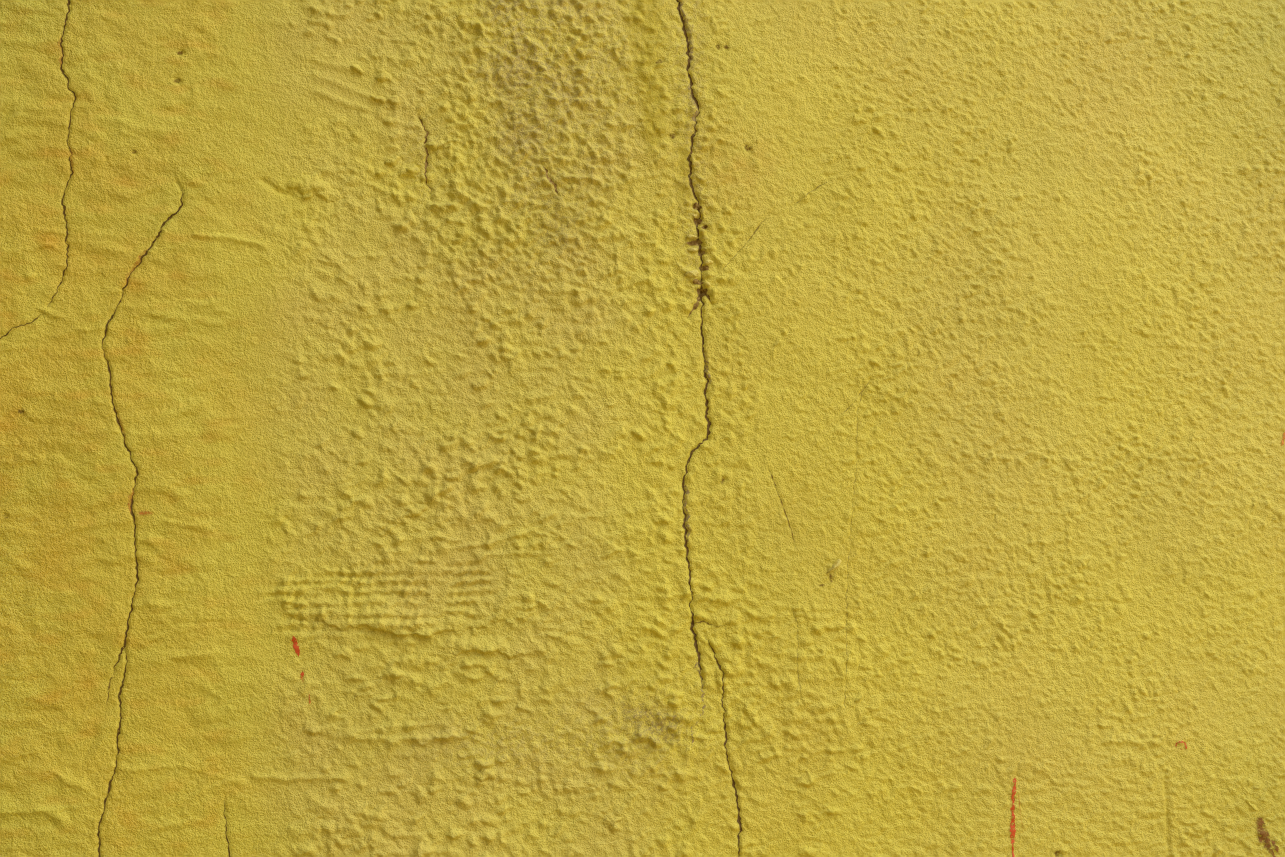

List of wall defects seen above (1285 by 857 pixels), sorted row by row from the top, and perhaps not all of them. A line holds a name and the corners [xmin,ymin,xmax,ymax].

crack [0,0,77,339]
crack [97,185,183,857]
crack [676,0,742,857]